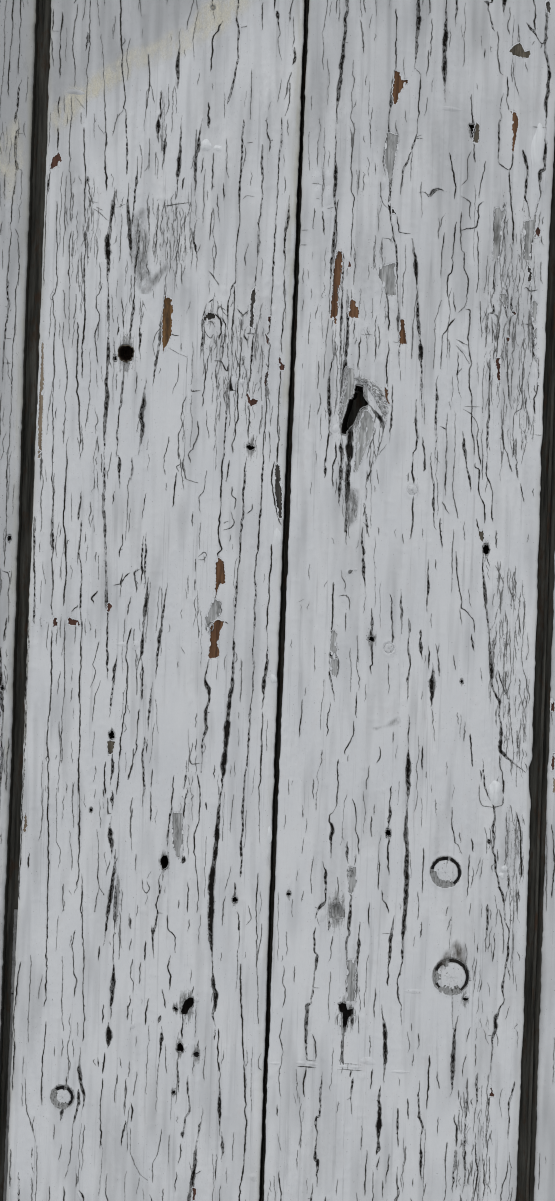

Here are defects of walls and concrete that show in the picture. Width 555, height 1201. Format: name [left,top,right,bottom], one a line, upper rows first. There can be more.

peeling [508,42,531,59]
peeling [391,71,409,105]
peeling [329,250,360,325]
peeling [161,294,174,354]
peeling [340,366,356,421]
peeling [354,410,377,473]
crack [9,0,296,1201]
peeling [204,557,226,660]
crack [545,822,555,911]